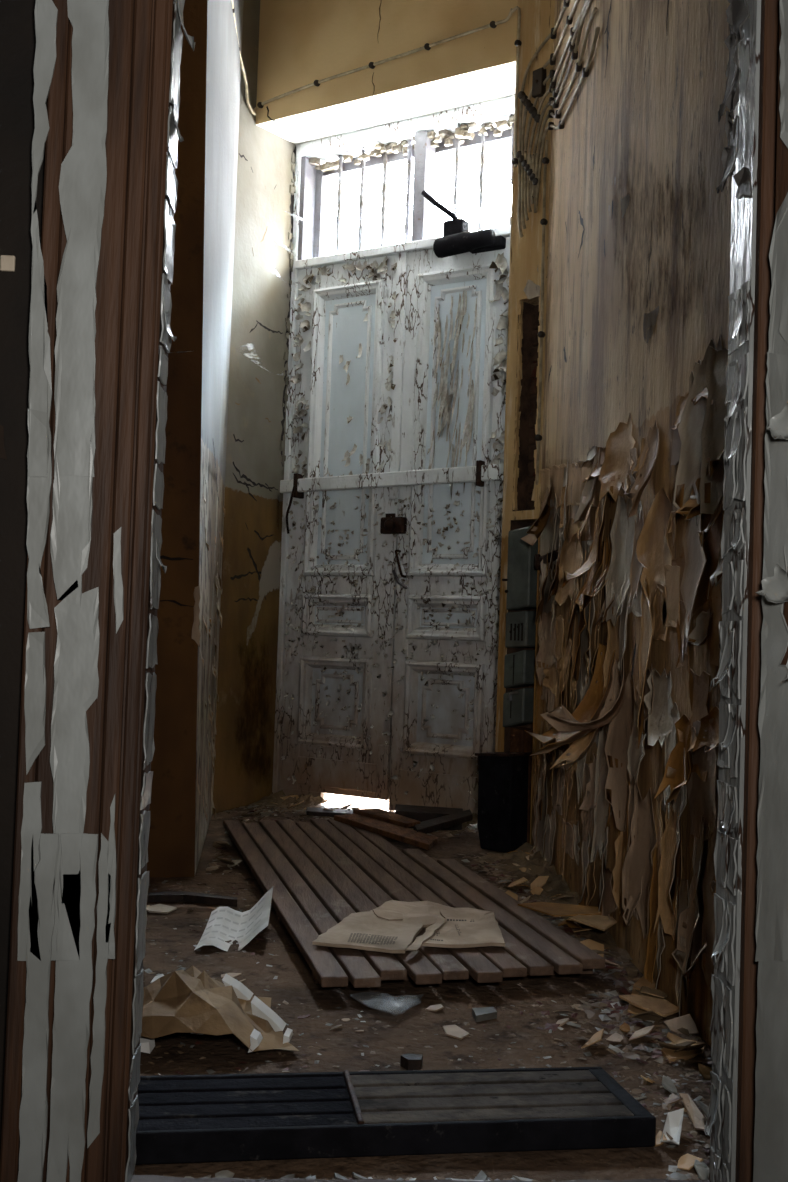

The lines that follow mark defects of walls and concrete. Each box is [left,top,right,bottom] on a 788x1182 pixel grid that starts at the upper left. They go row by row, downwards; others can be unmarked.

leakage [609,160,704,330]
peeling [766,403,788,440]
peeling [17,0,117,1182]
peeling [113,527,124,634]
peeling [125,0,195,1182]
peeling [192,528,224,821]
peeling [246,232,750,1182]
peeling [756,564,788,603]